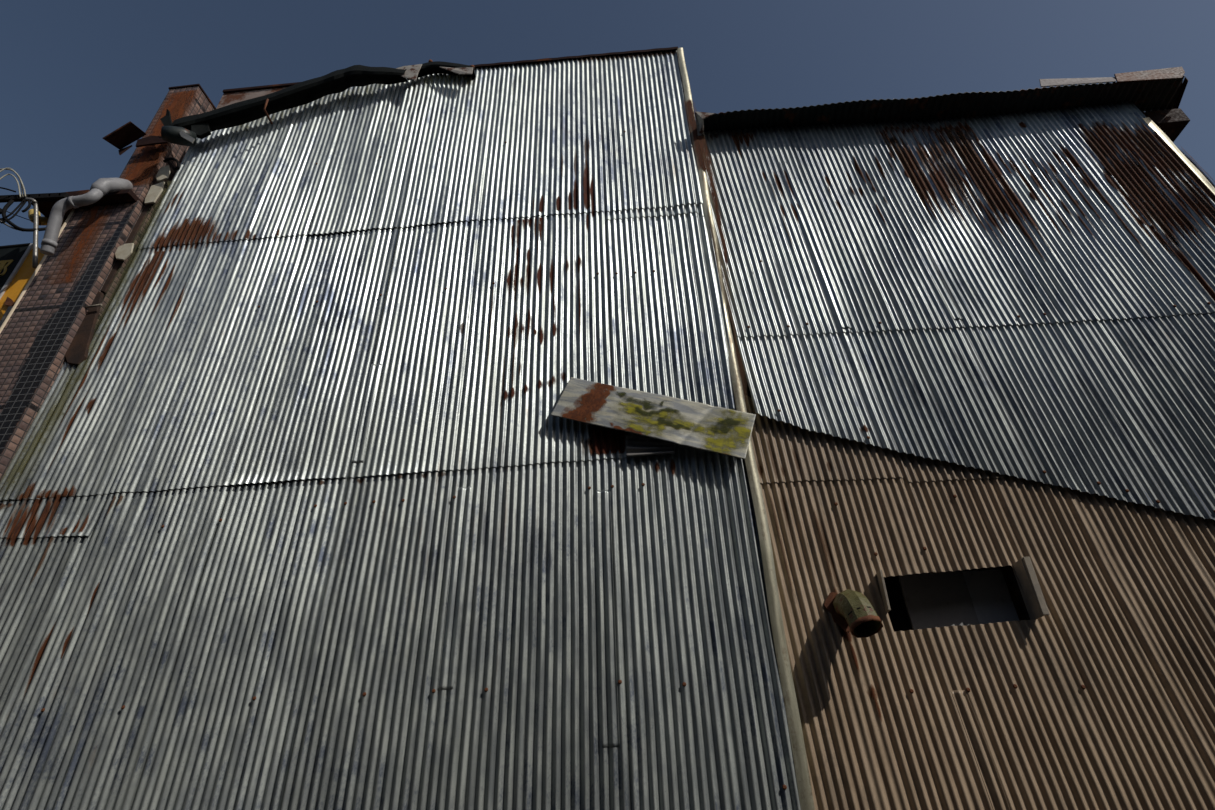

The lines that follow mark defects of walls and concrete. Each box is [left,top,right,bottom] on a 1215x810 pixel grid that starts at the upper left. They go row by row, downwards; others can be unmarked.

rust [50,192,256,466]
rust [485,138,594,425]
rust [562,383,643,454]
rust [762,171,799,245]
rust [846,121,1215,301]
rust [0,482,88,578]